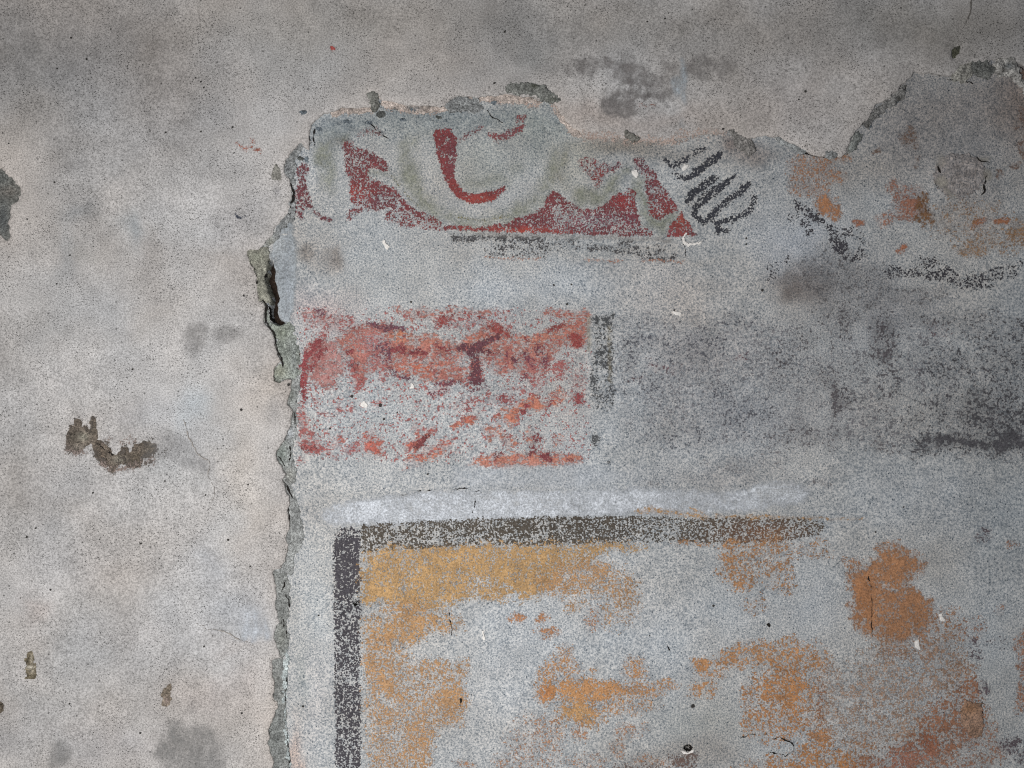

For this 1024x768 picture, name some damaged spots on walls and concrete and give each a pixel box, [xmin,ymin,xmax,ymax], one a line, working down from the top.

spalling [330,96,448,118]
spalling [469,82,727,146]
spalling [271,164,282,180]
spalling [0,169,21,241]
spalling [247,222,302,386]
spalling [64,416,168,476]
flaking render [959,700,984,738]